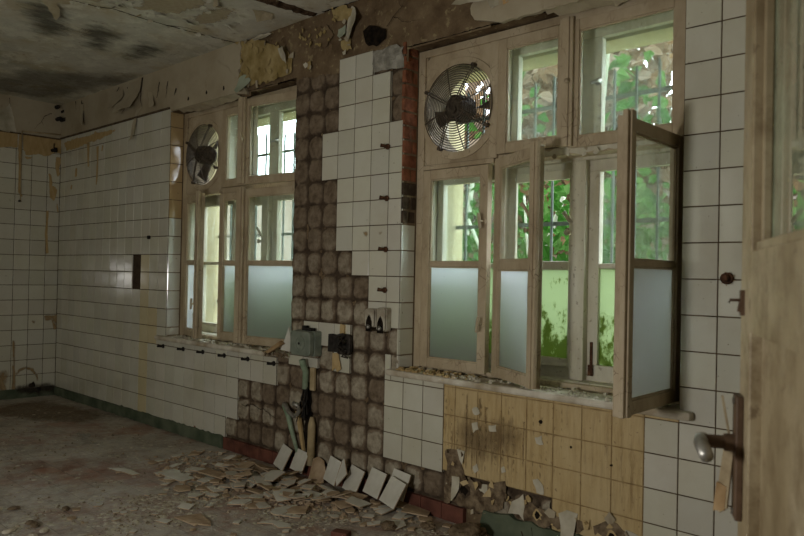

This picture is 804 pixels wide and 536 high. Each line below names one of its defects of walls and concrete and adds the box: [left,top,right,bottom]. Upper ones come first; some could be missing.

mould [26,4,65,34]
peeling [132,0,245,30]
peeling [133,255,141,289]
peeling [169,0,638,536]